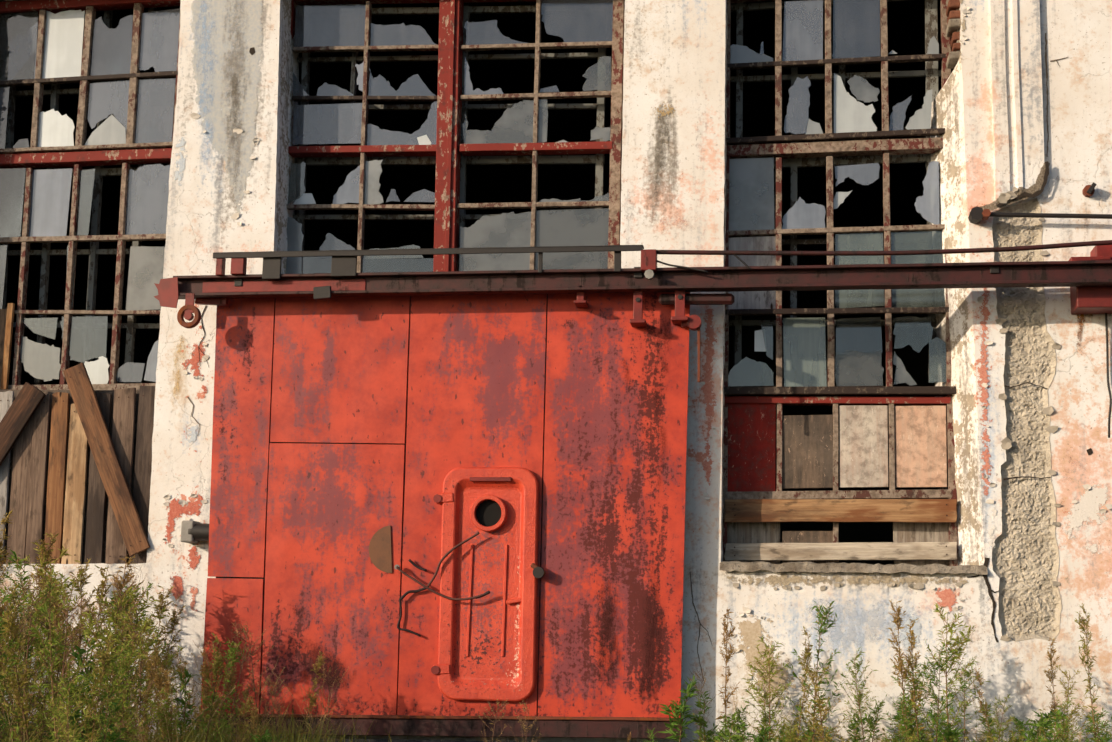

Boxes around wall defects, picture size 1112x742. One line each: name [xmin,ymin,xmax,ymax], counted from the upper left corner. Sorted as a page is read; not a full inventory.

leakage [225,30,243,167]
leakage [654,102,676,173]
flaking render [981,161,1050,262]
peeling [699,309,719,500]
flaking render [977,287,1112,642]
peeling [163,494,208,548]
peeling [170,544,201,611]
corrosion [597,587,618,683]
crack [967,558,998,642]